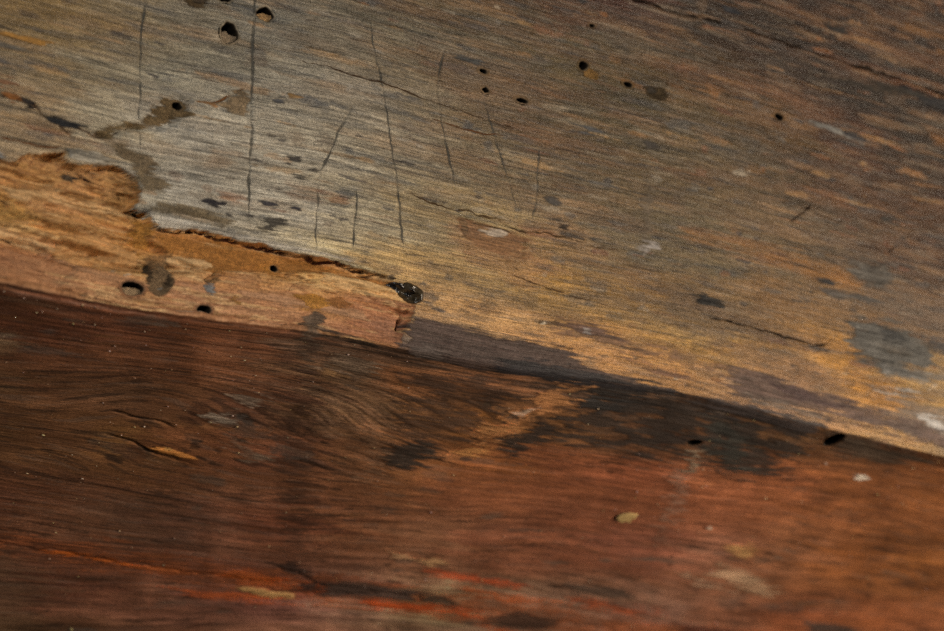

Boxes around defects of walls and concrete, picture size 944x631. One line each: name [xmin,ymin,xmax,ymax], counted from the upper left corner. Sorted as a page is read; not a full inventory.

peeling [66,148,122,166]